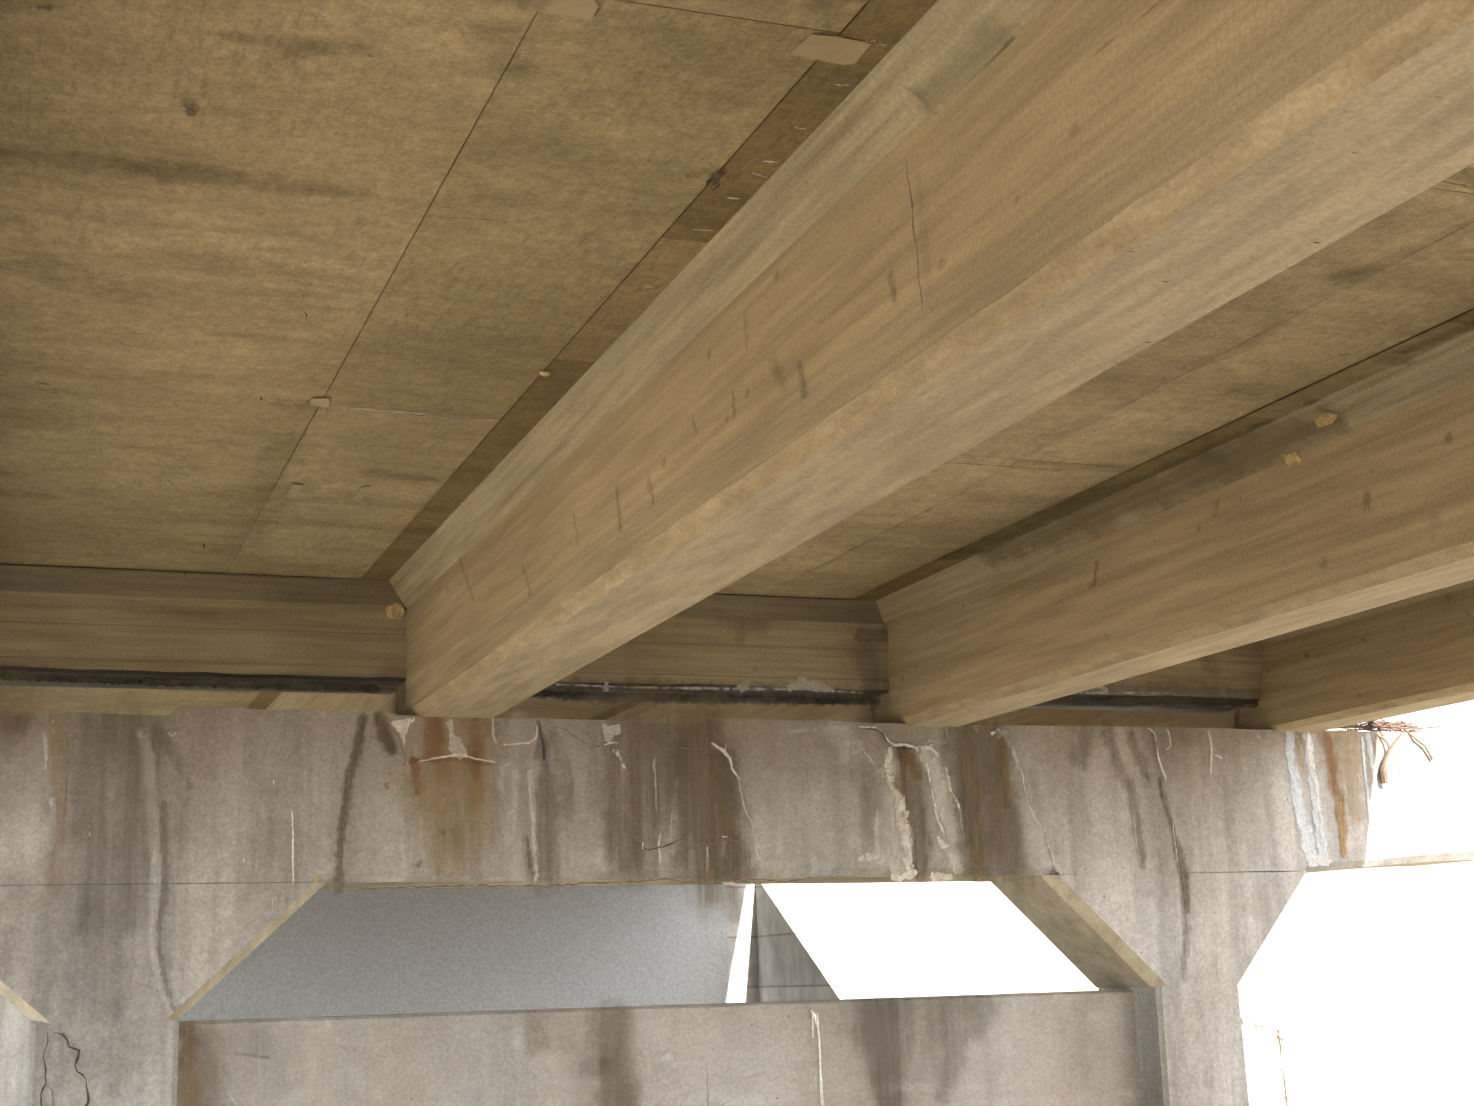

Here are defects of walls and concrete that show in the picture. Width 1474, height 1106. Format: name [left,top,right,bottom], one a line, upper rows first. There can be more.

damp [0,673,380,692]
damp [335,715,364,891]
efflorescence [1285,732,1333,867]
crack [40,1032,90,1106]